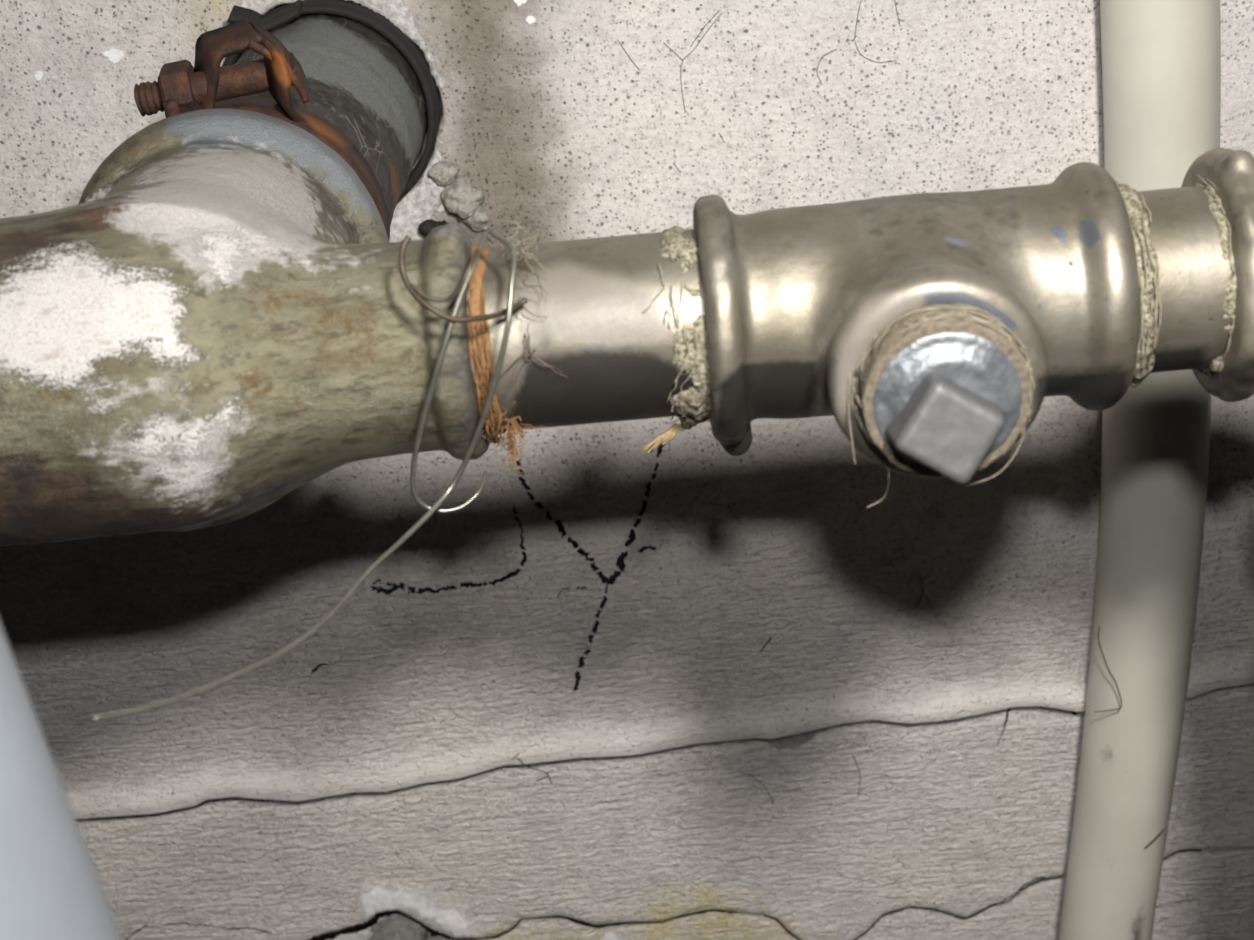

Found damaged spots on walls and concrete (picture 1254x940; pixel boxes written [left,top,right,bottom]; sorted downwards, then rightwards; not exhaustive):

crack [804,706,1085,746]
crack [76,739,770,821]
crack [1163,849,1201,859]
crack [854,876,1063,940]
crack [126,922,272,940]
flaking render [368,912,452,940]
crack [310,910,800,940]